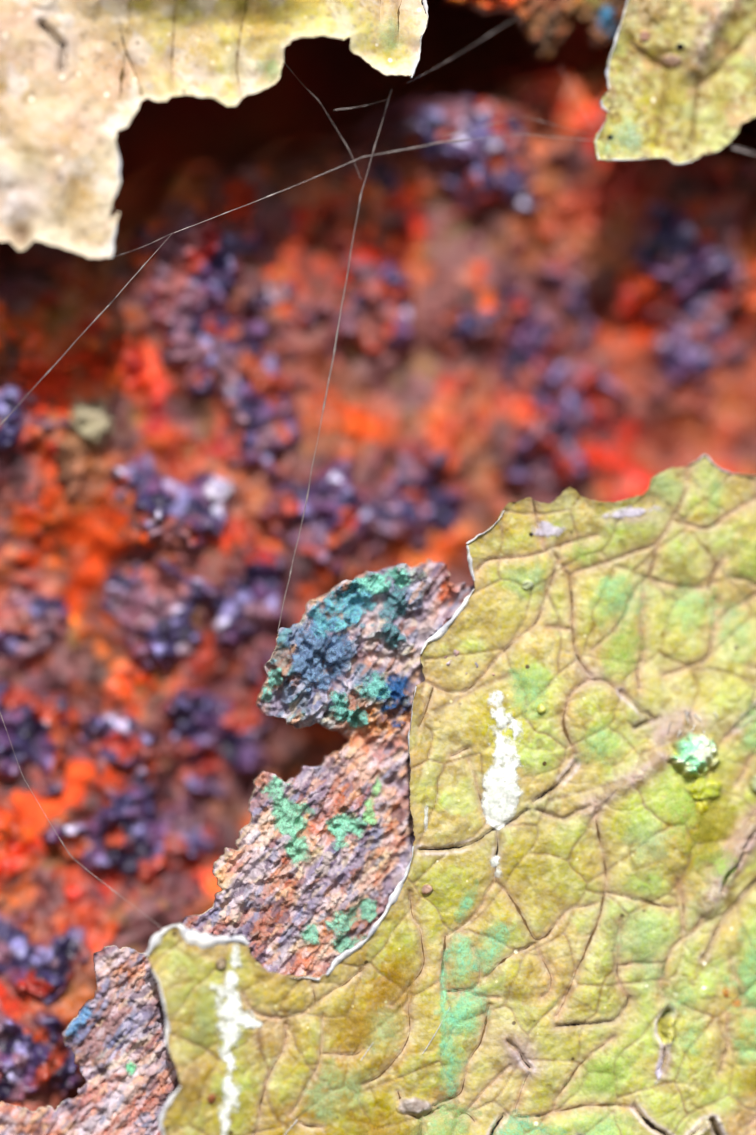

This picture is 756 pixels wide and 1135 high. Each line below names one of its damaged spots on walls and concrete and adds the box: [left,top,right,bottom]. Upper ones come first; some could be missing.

peeling [0,0,428,259]
corrosion [208,176,257,226]
peeling [593,0,756,165]
corrosion [17,336,130,416]
peeling [53,398,120,505]
corrosion [16,468,157,611]
corrosion [0,759,154,842]
peeling [144,454,756,1135]
water stain [481,691,523,830]
crack [365,470,756,1135]
water stain [210,945,262,1135]
crack [243,966,366,1133]